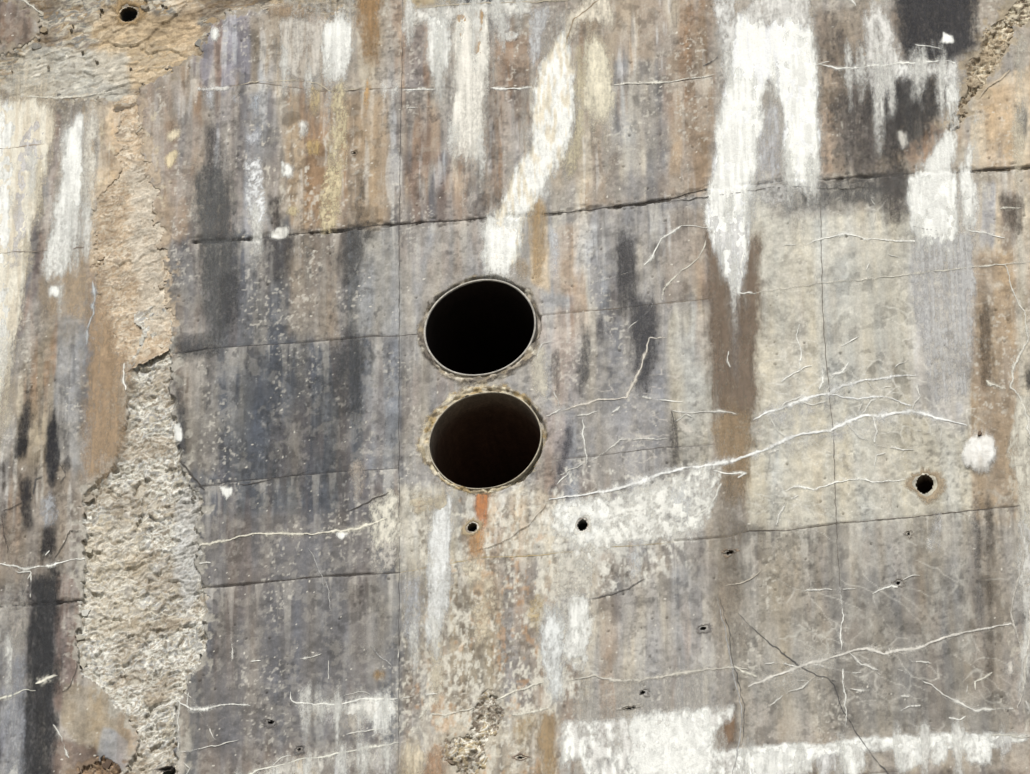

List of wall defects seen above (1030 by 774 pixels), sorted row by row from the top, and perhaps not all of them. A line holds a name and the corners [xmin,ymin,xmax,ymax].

damp [0,68,97,426]
efflorescence [402,0,614,280]
efflorescence [705,0,821,312]
spalling [948,0,1030,132]
spalling [0,0,366,774]
crack [175,692,250,774]
crack [199,492,389,611]
spalling [439,689,505,774]
corrosion [471,493,487,553]
crack [290,510,1030,774]
crack [483,322,967,549]
damp [560,672,1026,774]